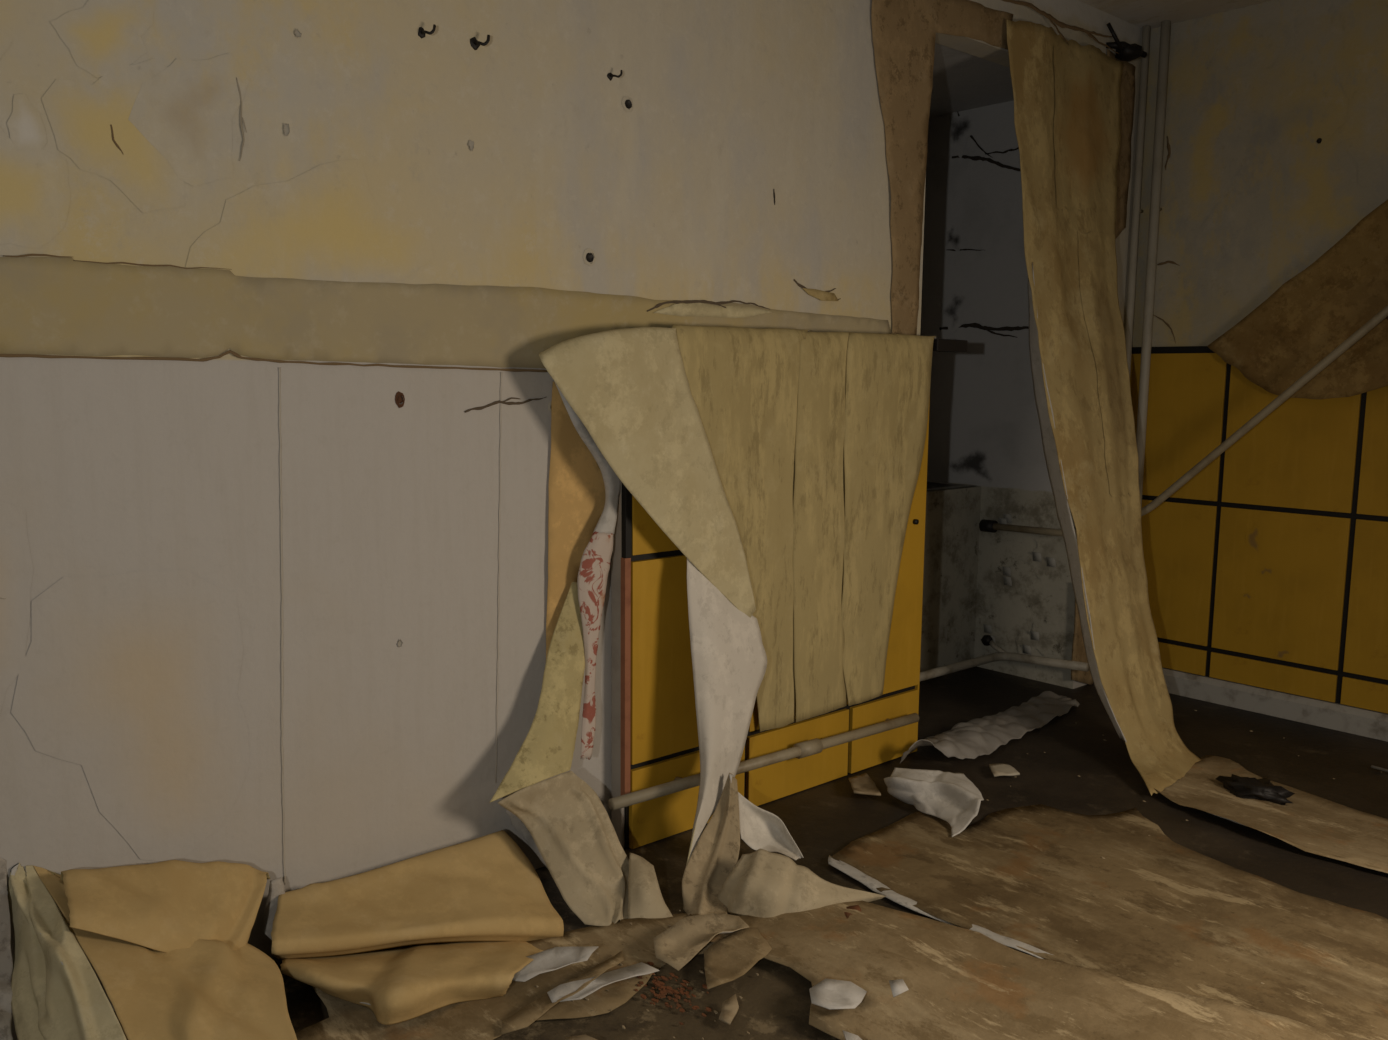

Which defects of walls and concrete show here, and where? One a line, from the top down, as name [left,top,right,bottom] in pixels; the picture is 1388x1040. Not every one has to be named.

peeling [989,763,1020,777]